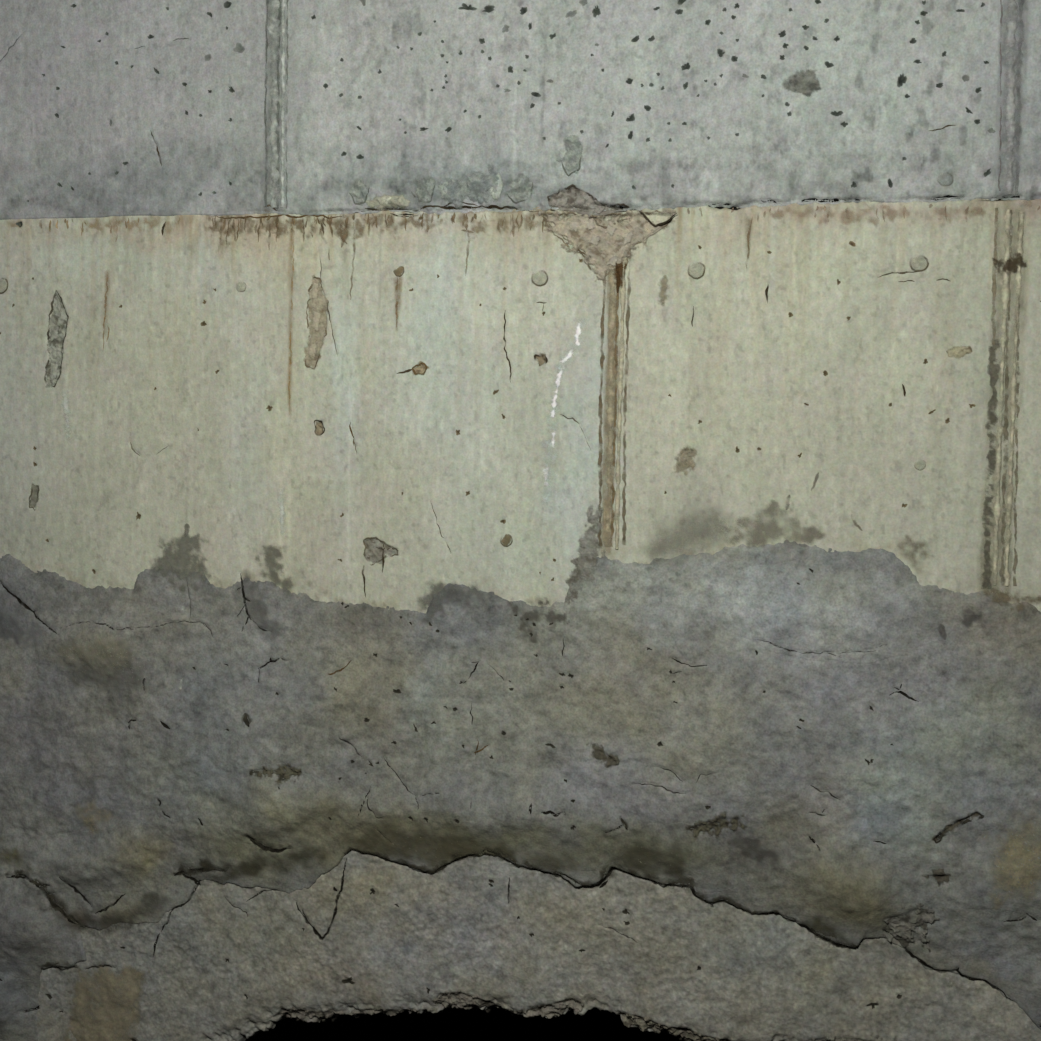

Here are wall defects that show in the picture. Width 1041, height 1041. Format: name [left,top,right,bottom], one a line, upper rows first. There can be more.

corrosion [40,218,146,240]
corrosion [209,212,486,252]
spalling [44,291,69,387]
water stain [152,523,206,591]
spalling [362,537,398,597]
peeling [539,507,605,604]
water stain [654,495,790,554]
water stain [793,523,823,543]
crack [5,870,125,924]
crack [225,785,857,949]
crack [884,930,1014,1002]
spalling [279,988,583,1022]